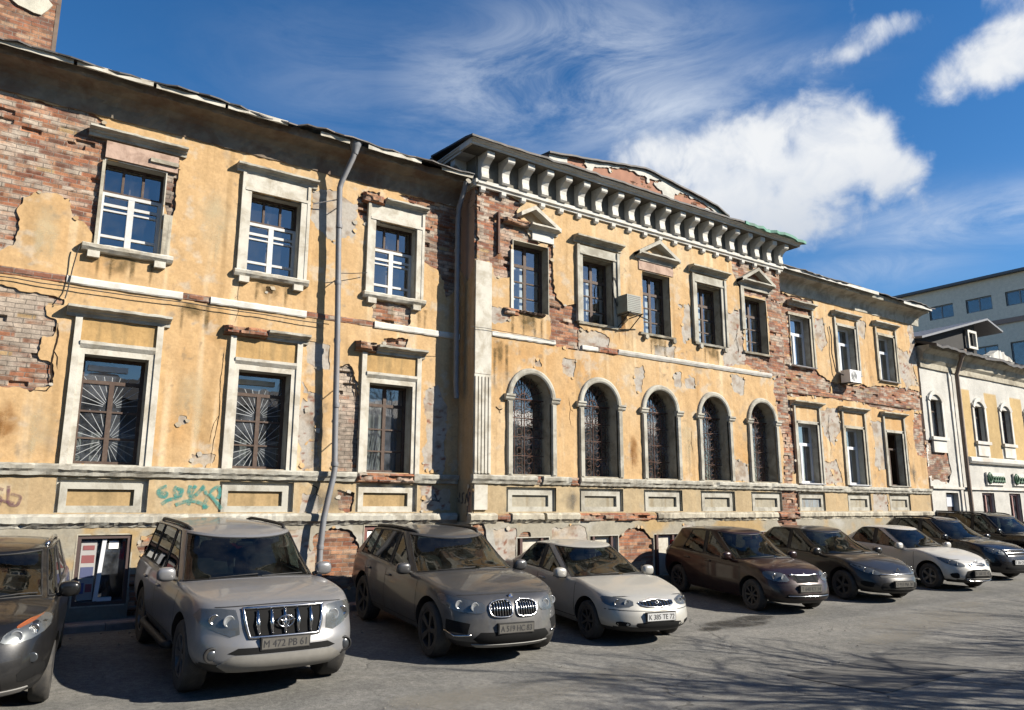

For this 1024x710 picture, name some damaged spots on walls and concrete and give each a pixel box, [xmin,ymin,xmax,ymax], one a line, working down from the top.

flaking render [0,90,107,250]
flaking render [0,285,64,392]
flaking render [298,341,359,472]
flaking render [399,178,609,379]
flaking render [722,259,951,526]
flaking render [289,526,359,590]
flaking render [619,525,654,575]